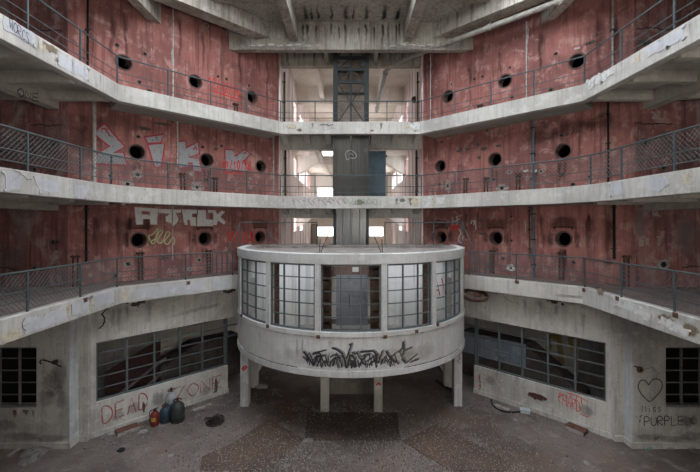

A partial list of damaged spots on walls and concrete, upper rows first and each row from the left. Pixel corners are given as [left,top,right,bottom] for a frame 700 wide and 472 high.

damp [247,6,435,61]
peeling [1,170,22,192]
peeling [32,167,60,194]
peeling [74,184,88,199]
peeling [612,294,691,338]